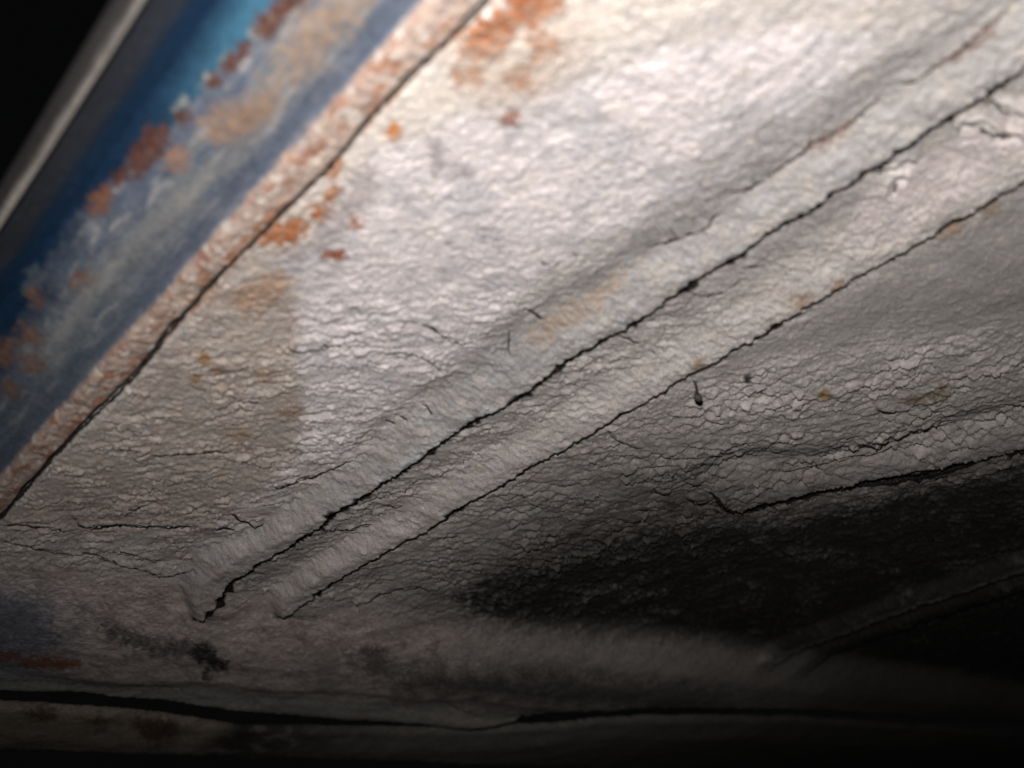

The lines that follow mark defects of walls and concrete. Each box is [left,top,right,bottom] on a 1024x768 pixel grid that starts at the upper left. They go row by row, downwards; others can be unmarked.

rust [206,0,304,87]
rust [451,0,564,92]
rust [90,111,193,215]
rust [260,160,342,246]
rust [387,123,400,140]
rust [501,111,519,125]
crack [647,12,1006,249]
crack [0,0,492,578]
rust [322,250,348,260]
crack [193,68,1024,621]